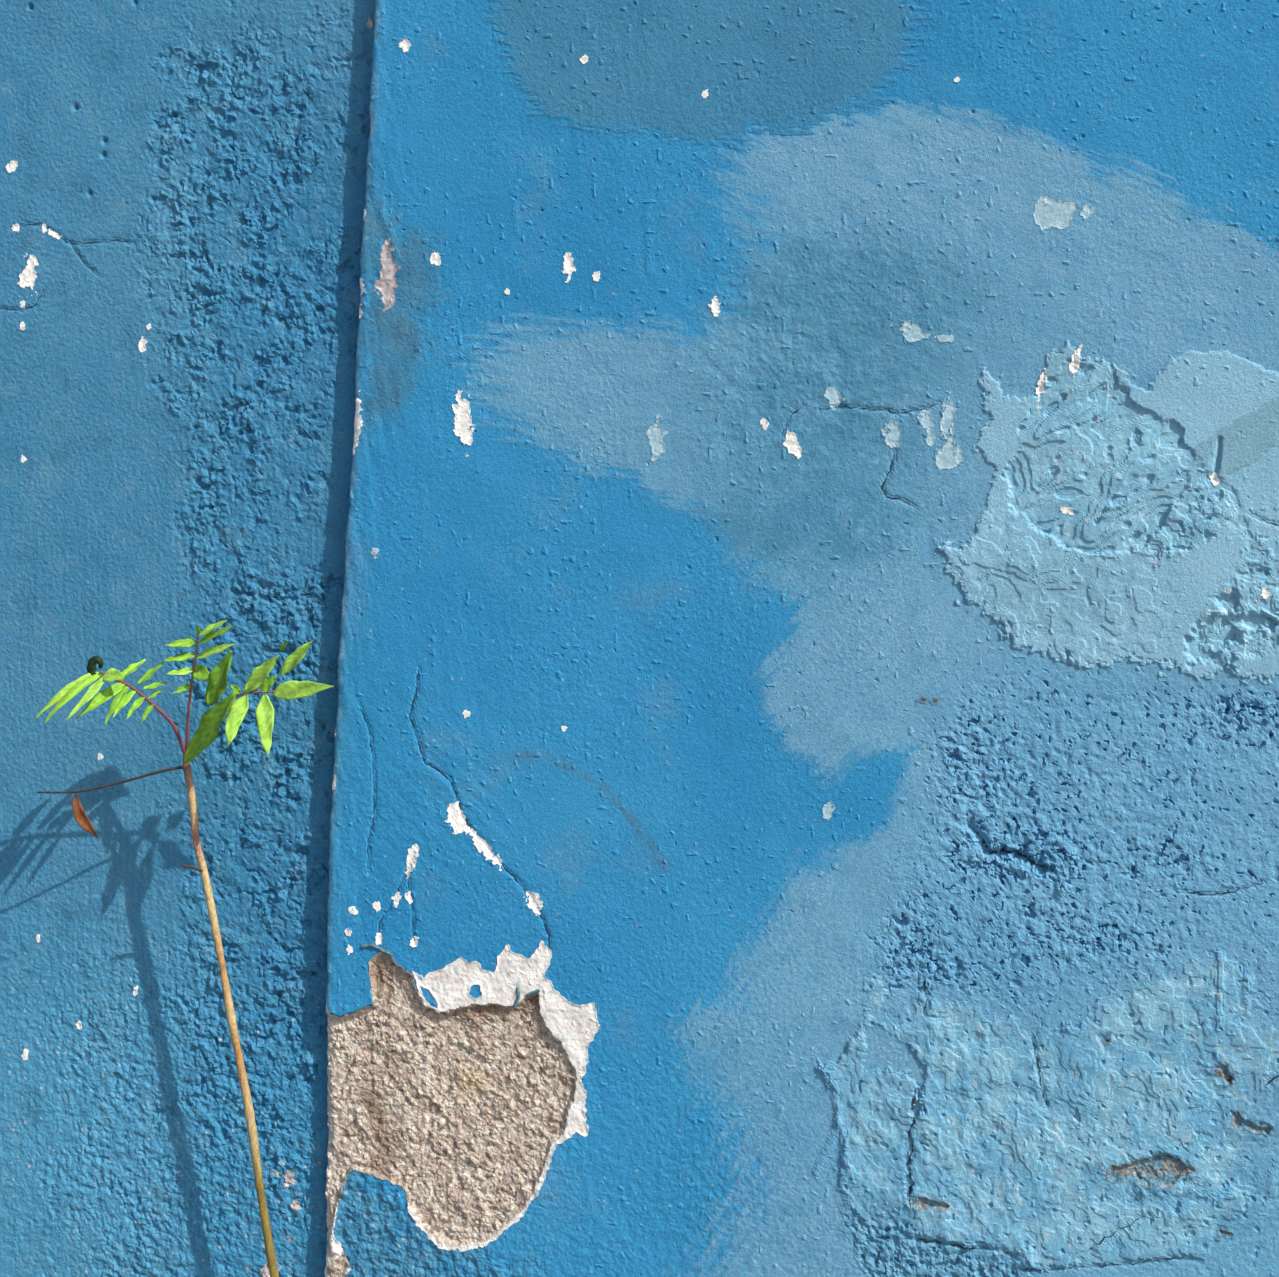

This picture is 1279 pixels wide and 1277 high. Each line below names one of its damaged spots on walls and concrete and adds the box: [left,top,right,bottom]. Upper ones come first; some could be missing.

peeling [1033,195,1095,231]
peeling [359,237,400,318]
peeling [452,390,475,457]
crack [783,403,938,432]
crack [881,454,913,506]
crack [361,708,376,861]
crack [409,673,478,836]
peeling [372,844,419,912]
crack [503,866,550,948]
peeling [523,891,543,916]
flaking render [324,906,600,1277]
flaking render [815,955,1279,1277]